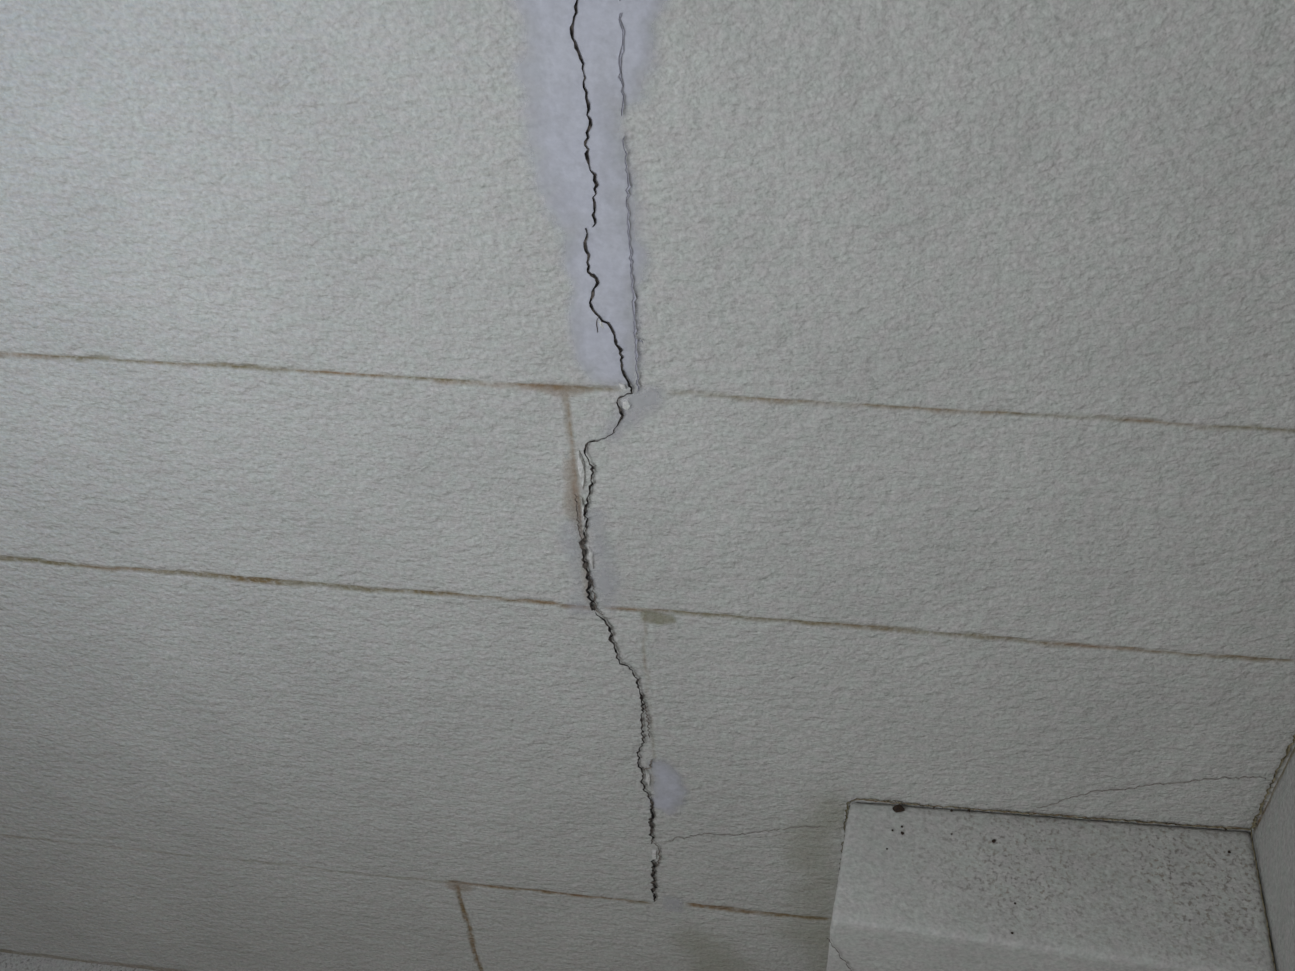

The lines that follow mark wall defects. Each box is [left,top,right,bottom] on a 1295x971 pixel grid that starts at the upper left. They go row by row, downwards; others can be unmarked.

crack [570,0,820,902]